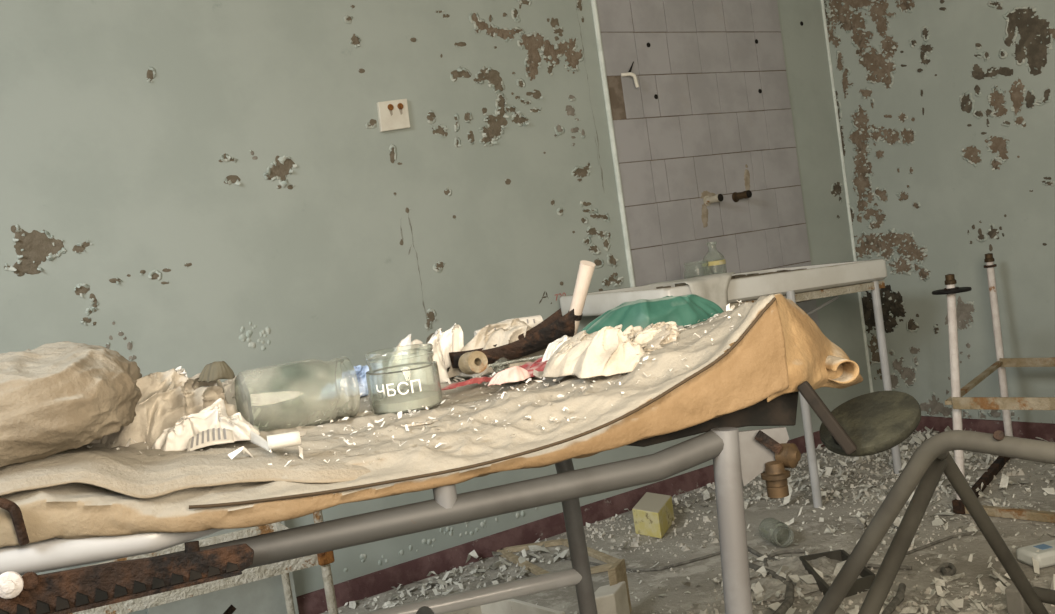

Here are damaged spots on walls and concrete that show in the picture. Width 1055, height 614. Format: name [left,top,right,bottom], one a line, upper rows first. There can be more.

peeling [427,0,586,147]
peeling [959,0,1055,170]
peeling [219,153,241,185]
peeling [249,150,297,189]
peeling [823,0,937,282]
peeling [4,224,92,277]
peeling [572,201,623,291]
peeling [967,214,1007,251]